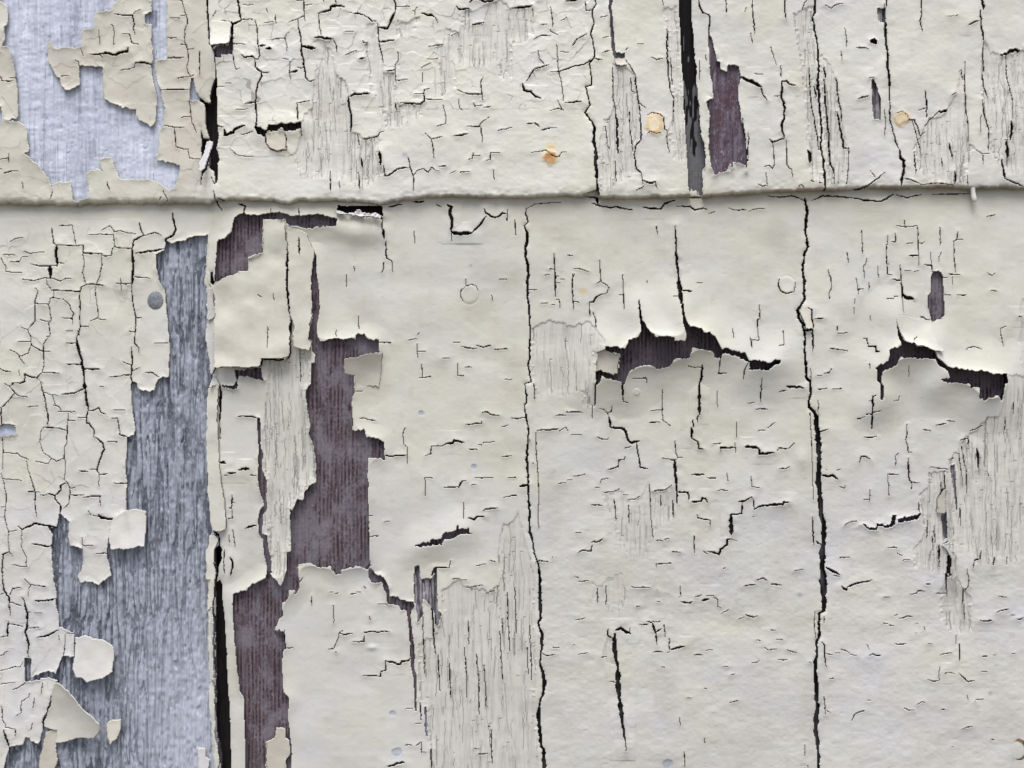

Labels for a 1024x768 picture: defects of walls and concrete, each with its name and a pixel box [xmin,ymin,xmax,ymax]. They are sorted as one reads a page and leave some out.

peeling [0,0,180,207]
peeling [199,141,213,172]
crack [61,0,1022,304]
rust [539,146,562,168]
rust [642,109,668,139]
peeling [663,0,749,199]
crack [0,190,177,747]
peeling [4,205,539,768]
crack [336,316,508,378]
peeling [532,315,776,412]
crack [363,220,1023,768]
peeling [861,271,1024,635]